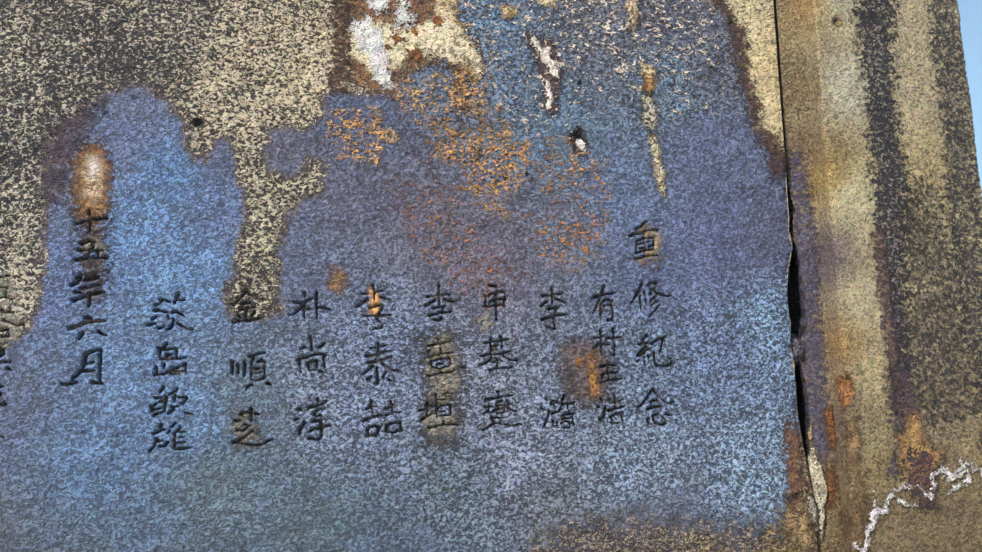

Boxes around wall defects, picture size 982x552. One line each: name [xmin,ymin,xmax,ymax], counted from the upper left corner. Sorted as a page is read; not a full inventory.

corrosion [32,98,108,209]
corrosion [316,0,612,308]
spalling [340,0,734,155]
corrosion [554,330,617,414]
crack [773,0,814,465]
corrosion [870,227,946,515]
damp [848,0,982,435]